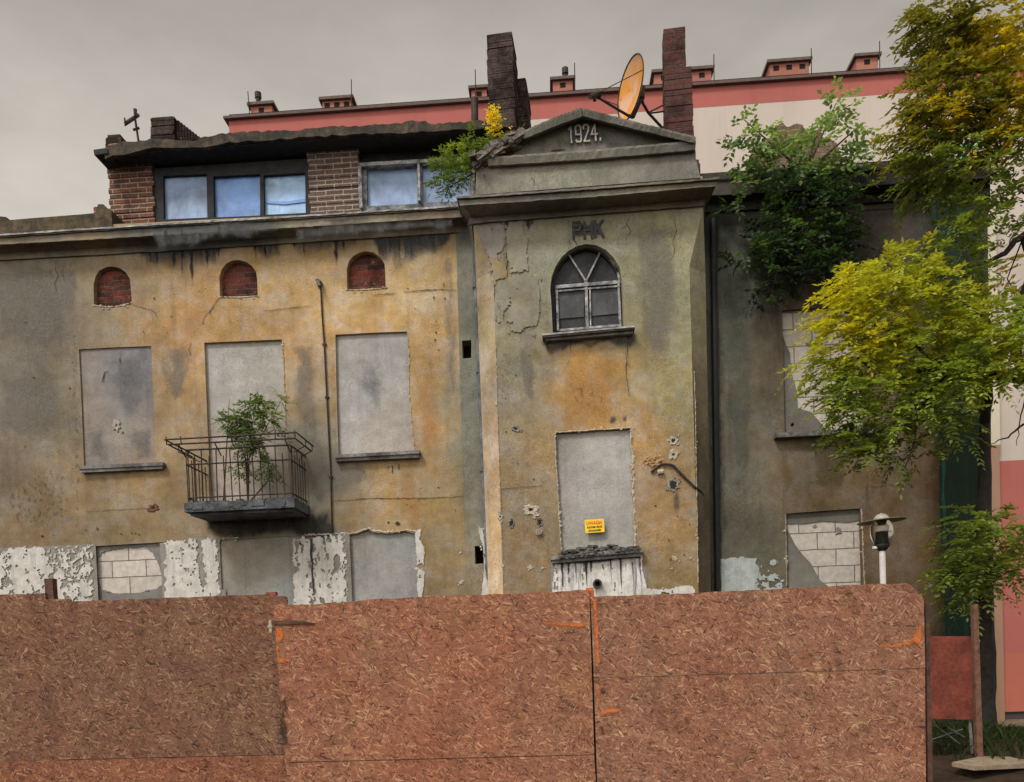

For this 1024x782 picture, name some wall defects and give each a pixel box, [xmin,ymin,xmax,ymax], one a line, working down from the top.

water stain [141,230,220,277]
water stain [293,239,355,261]
spalling [495,346,543,578]
peeling [527,371,699,597]
peeling [0,532,239,601]
peeling [289,520,425,605]
spalling [721,509,866,592]